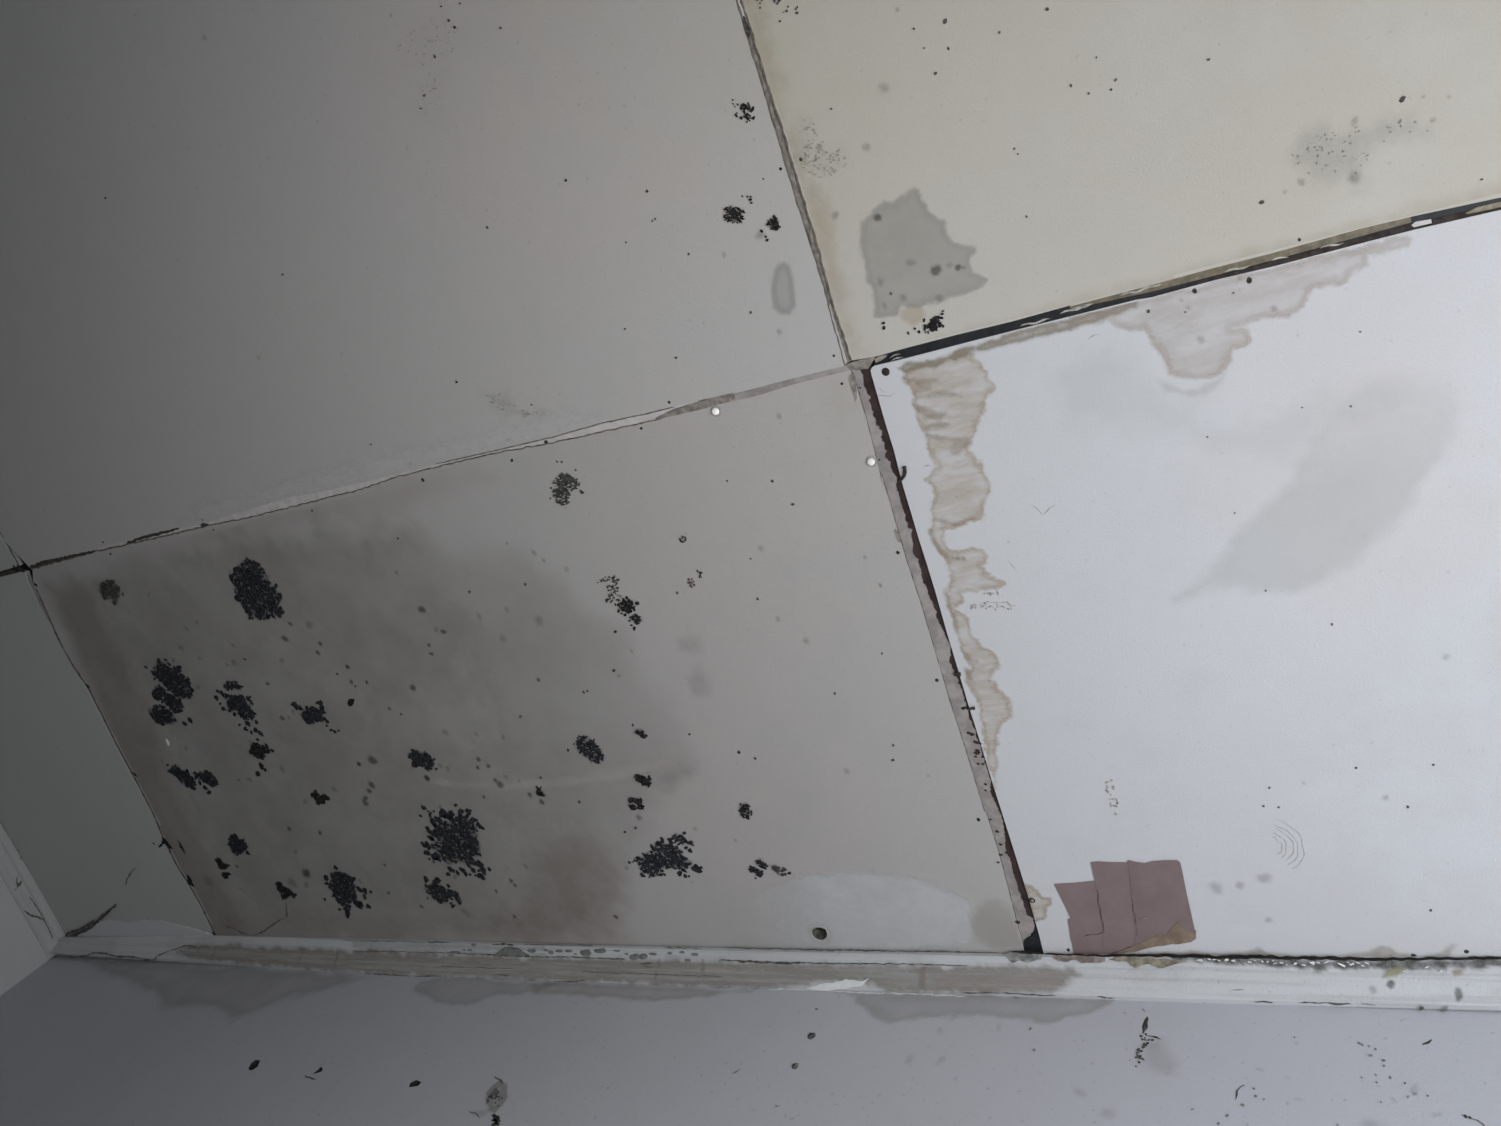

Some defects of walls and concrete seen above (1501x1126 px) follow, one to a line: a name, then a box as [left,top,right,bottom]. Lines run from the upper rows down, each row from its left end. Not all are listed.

damp [550,461,584,506]
damp [229,557,285,620]
damp [597,575,641,633]
damp [144,658,194,726]
damp [214,681,274,776]
damp [291,700,340,733]
damp [567,735,604,764]
damp [166,764,219,795]
damp [624,774,652,833]
damp [419,796,497,908]
damp [628,832,703,878]
damp [305,865,390,919]